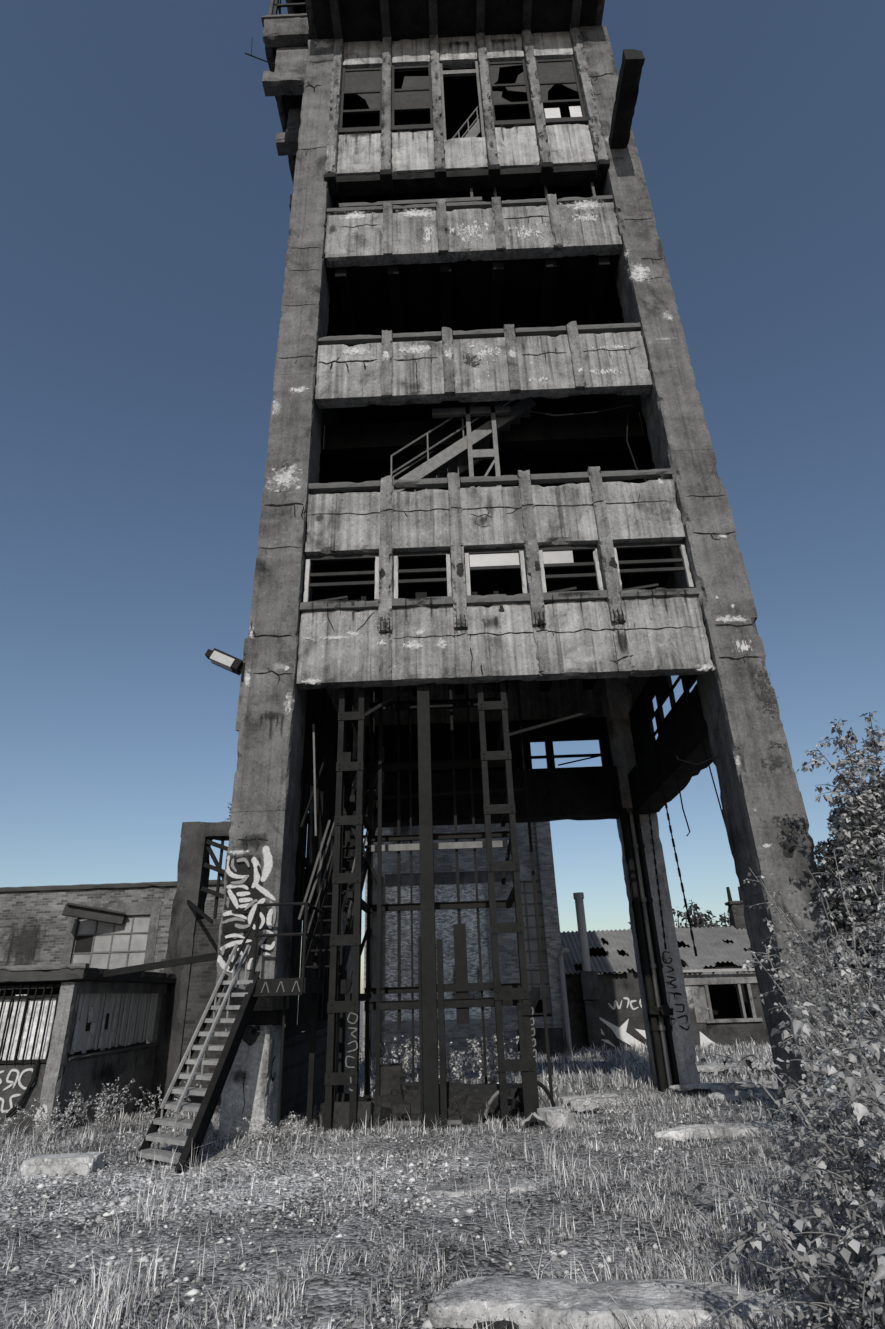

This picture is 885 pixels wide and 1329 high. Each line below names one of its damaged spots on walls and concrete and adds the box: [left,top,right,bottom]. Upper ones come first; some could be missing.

spalling [625,250,650,282]
spalling [267,465,301,492]
crack [251,622,294,683]